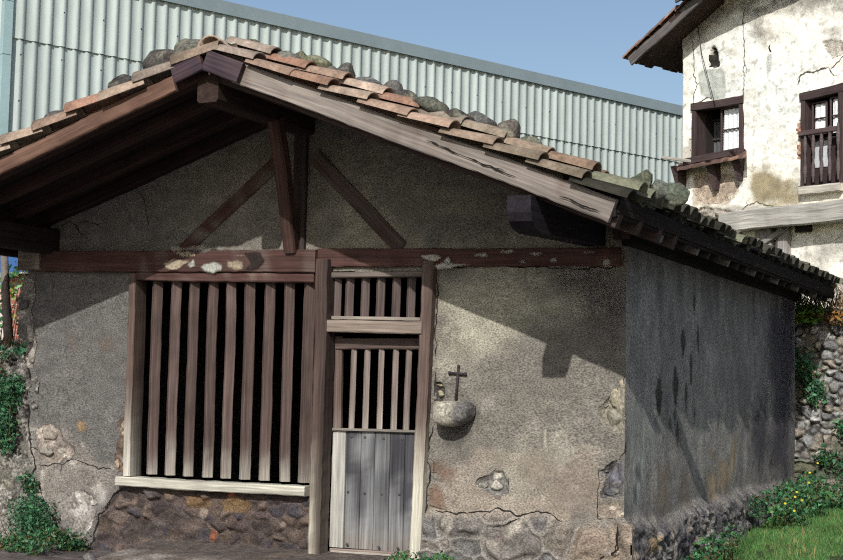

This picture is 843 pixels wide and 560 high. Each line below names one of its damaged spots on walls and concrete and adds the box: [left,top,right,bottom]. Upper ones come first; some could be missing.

crack [692,41,712,103]
crack [797,56,843,85]
spalling [822,39,843,58]
spalling [694,174,739,221]
peeling [164,246,264,273]
peeling [422,254,461,269]
water stain [669,331,699,445]
spalling [36,424,75,463]
crack [26,368,112,527]
crack [425,428,561,527]
spalling [58,489,99,538]
crack [84,488,123,548]